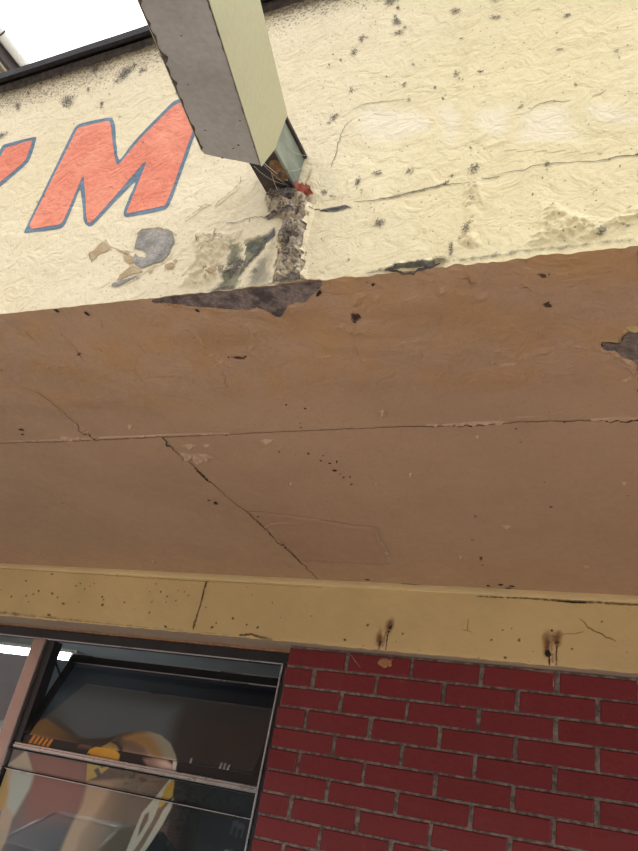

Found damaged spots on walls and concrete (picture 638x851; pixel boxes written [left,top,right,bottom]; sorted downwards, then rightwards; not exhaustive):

crack [331,99,403,167]
crack [184,150,638,242]
peeling [88,226,179,288]
spalling [152,281,322,320]
peeling [600,326,638,382]
crack [336,421,517,430]
crack [538,415,638,423]
crack [0,392,321,628]
rust [377,621,392,650]
rust [544,630,560,665]